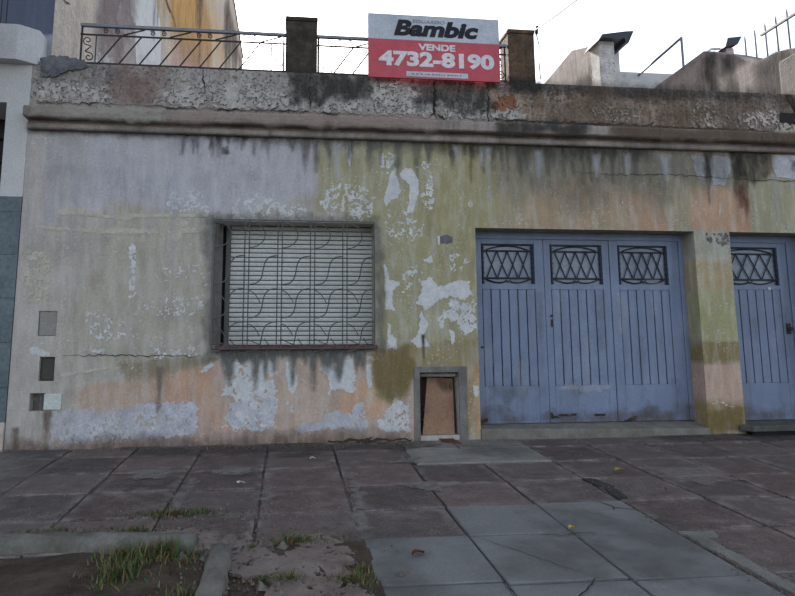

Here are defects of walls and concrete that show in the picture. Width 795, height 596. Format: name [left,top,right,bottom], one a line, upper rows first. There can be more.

peeling [31,52,527,130]
water stain [415,80,498,114]
water stain [508,77,541,92]
water stain [554,75,795,143]
water stain [279,138,436,170]
peeling [383,254,477,350]
peeling [50,401,200,445]
peeling [199,357,298,433]
water stain [222,347,414,391]
peeling [319,353,378,396]
peeling [295,397,411,436]
crack [475,536,639,596]